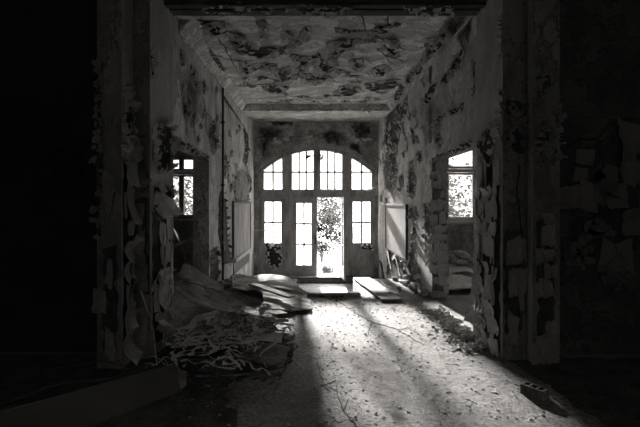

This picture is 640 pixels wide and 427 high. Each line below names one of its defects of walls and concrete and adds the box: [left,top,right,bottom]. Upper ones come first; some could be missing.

peeling [88,58,107,242]
peeling [91,48,252,365]
peeling [198,2,558,358]